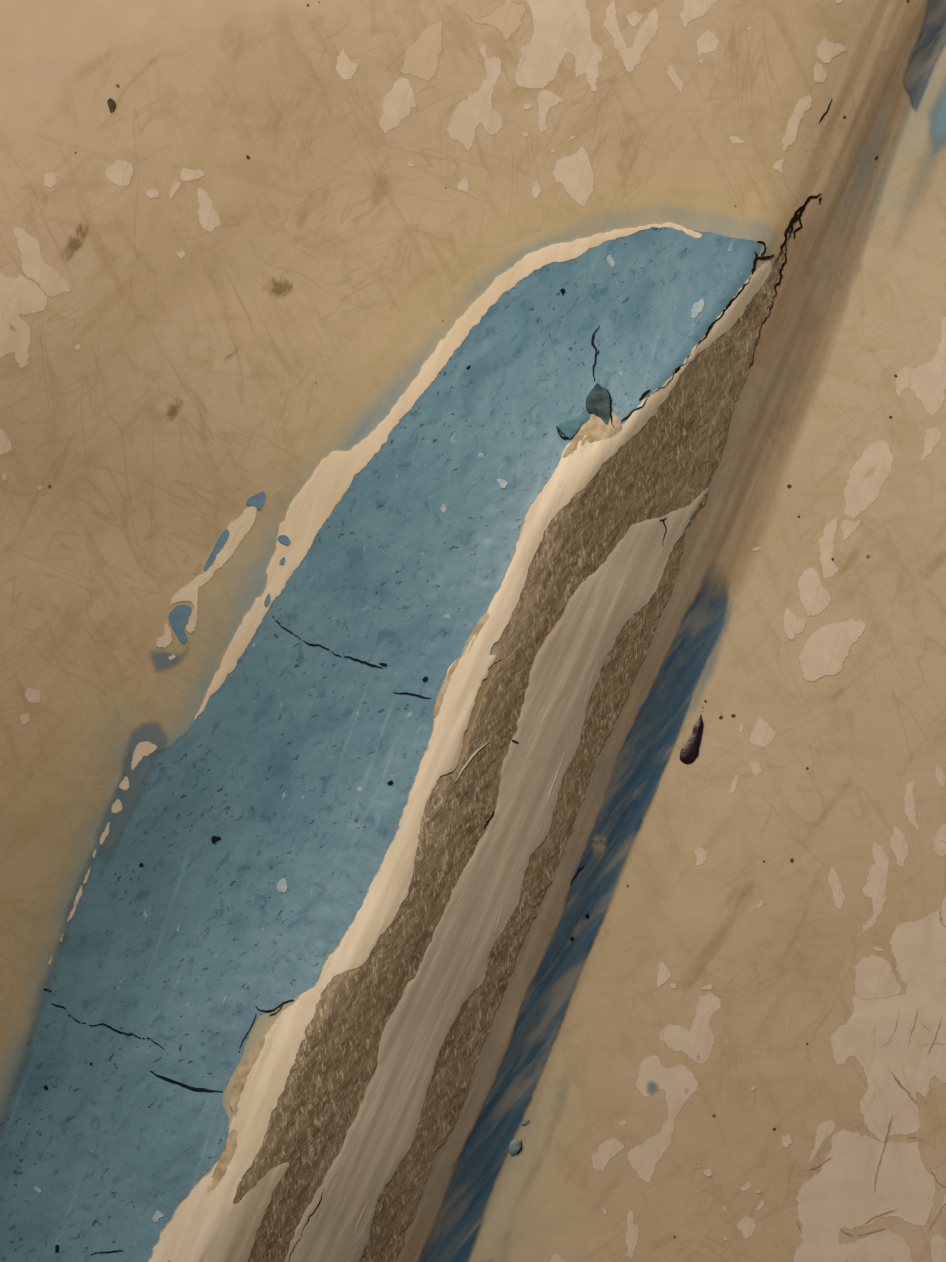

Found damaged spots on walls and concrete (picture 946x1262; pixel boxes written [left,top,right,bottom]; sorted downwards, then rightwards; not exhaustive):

peeling [379,20,443,134]
peeling [447,0,659,150]
peeling [551,136,595,207]
peeling [773,38,848,174]
crack [591,327,599,381]
crack [621,193,822,422]
peeling [783,440,894,682]
crack [273,616,428,698]
peeling [0,222,795,1262]
peeling [862,781,919,935]
crack [44,989,223,1092]
peeling [793,896,946,1262]